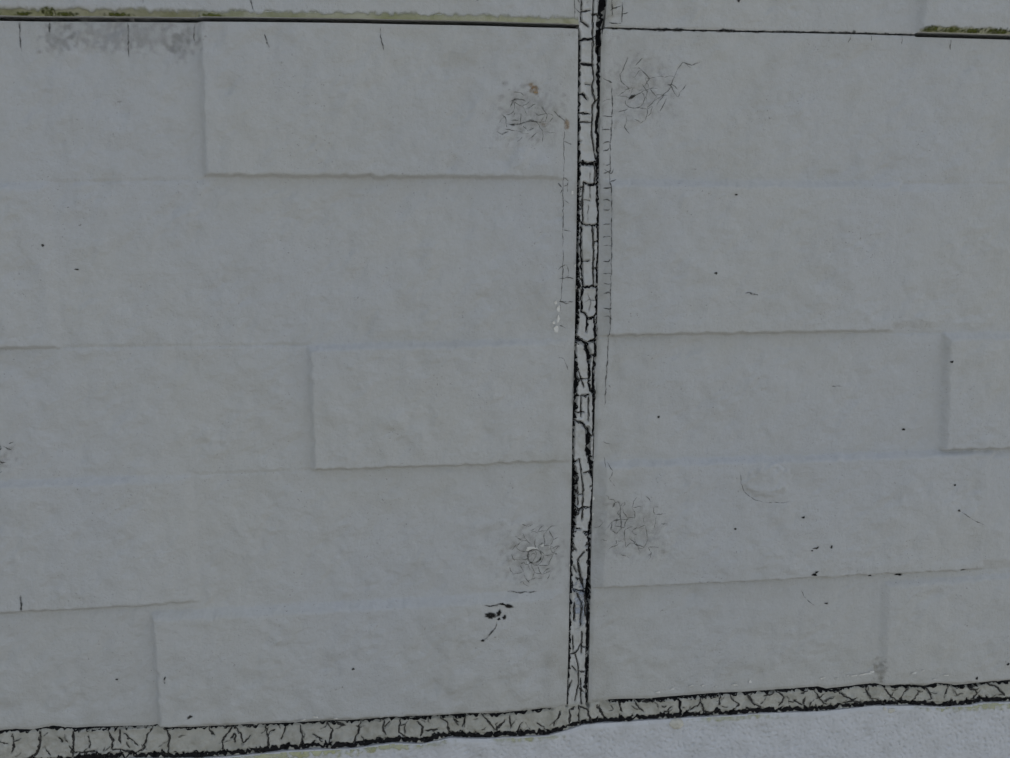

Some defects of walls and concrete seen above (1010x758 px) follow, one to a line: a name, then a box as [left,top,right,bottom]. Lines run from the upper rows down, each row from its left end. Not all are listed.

crack [611,23,710,32]
crack [719,29,912,43]
crack [499,92,560,140]
crack [620,61,694,123]
crack [567,0,606,705]
crack [609,499,658,556]
crack [510,524,558,593]
crack [0,729,32,753]